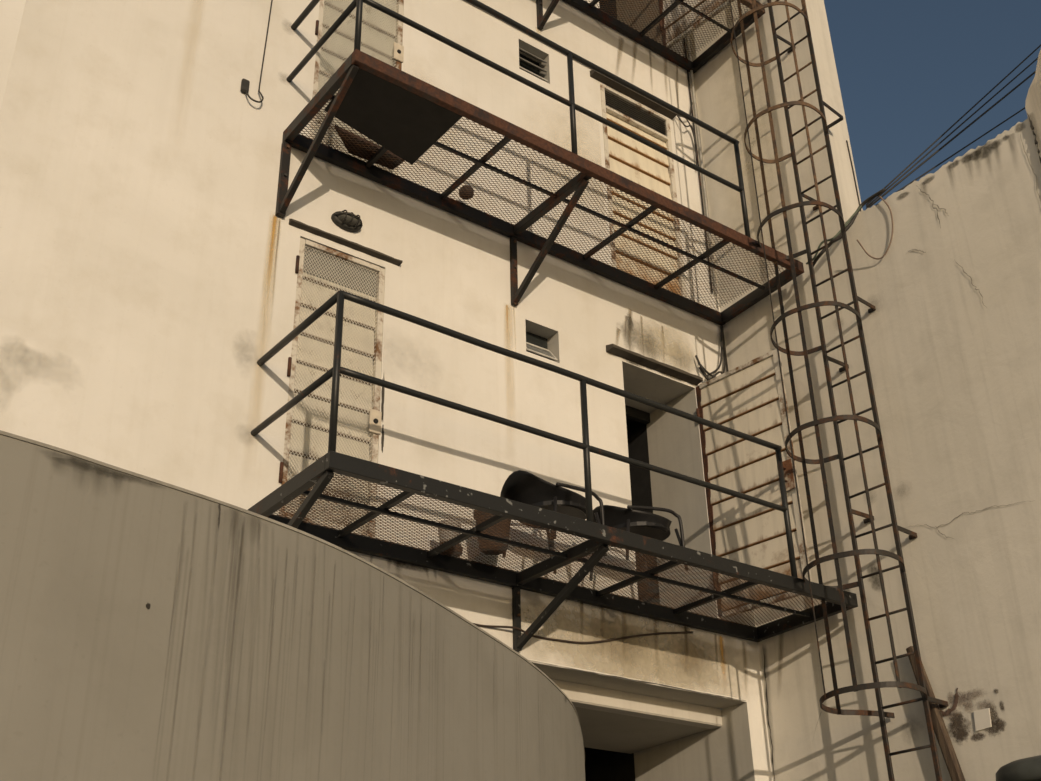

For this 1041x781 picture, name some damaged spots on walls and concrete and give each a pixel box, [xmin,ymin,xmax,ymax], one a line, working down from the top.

leakage [952,126,1022,166]
crack [917,186,949,228]
corrosion [268,216,280,290]
leakage [70,457,140,479]
crack [904,501,1031,539]